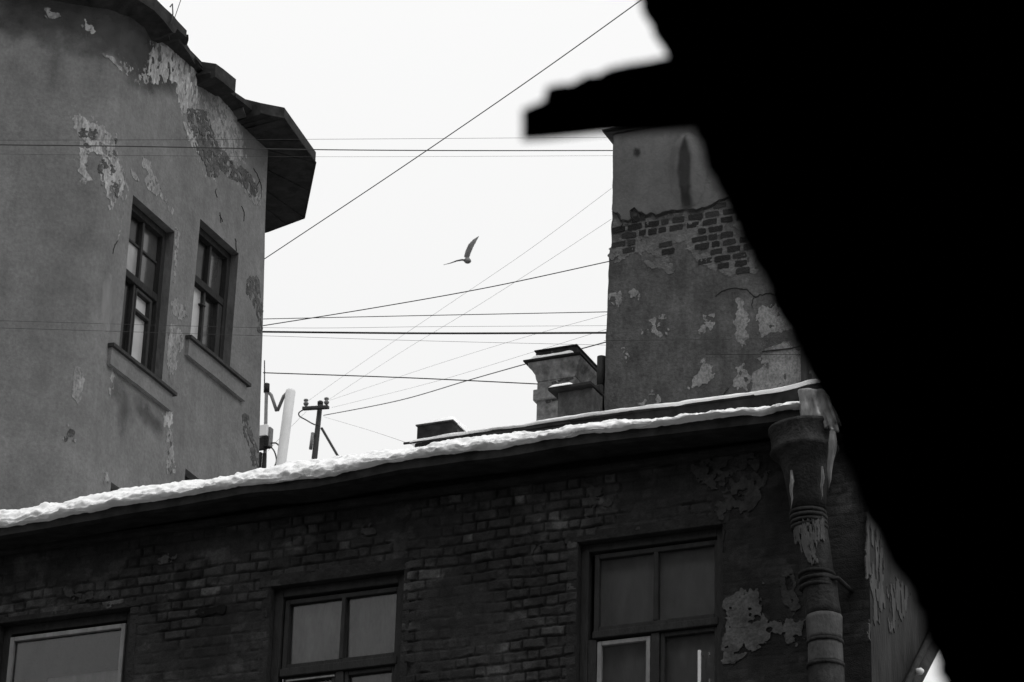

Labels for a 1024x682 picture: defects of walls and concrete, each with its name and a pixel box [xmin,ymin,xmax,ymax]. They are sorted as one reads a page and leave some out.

flaking render [102,40,263,203]
peeling [70,104,180,283]
flaking render [607,201,758,277]
peeling [687,358,715,390]
peeling [733,297,811,392]
peeling [721,564,806,664]
peeling [793,516,825,564]
peeling [864,521,911,641]